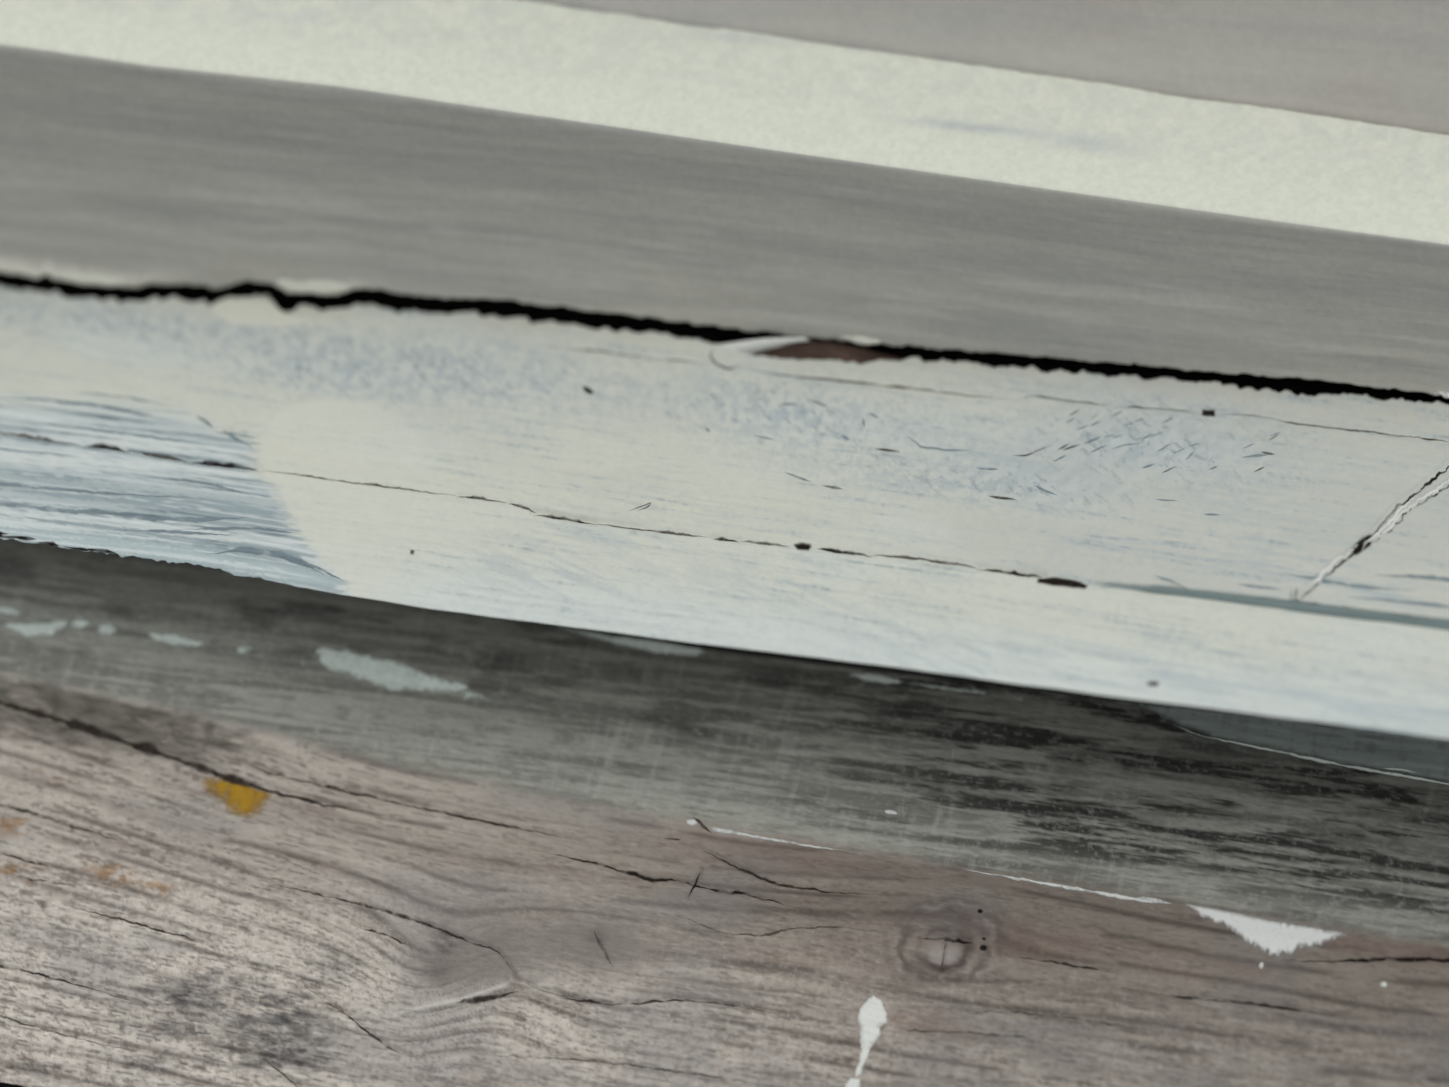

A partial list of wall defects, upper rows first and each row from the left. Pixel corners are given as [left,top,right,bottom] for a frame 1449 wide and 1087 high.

crack [0,272,749,362]
peeling [26,393,172,420]
peeling [74,427,192,443]
peeling [0,477,340,579]
crack [0,432,1039,577]
crack [763,335,1449,611]